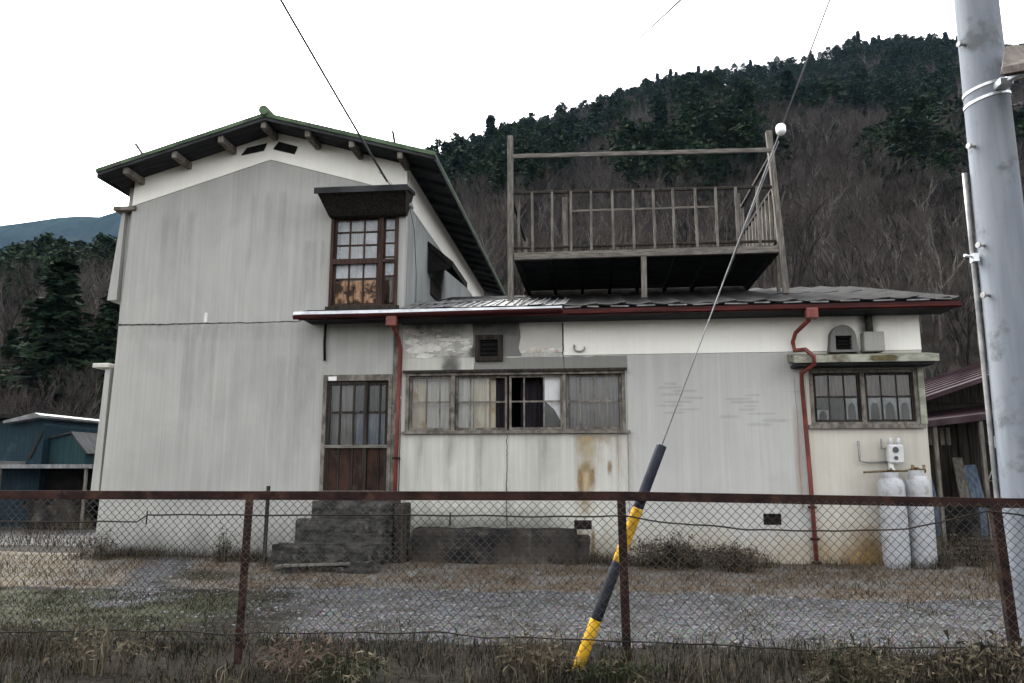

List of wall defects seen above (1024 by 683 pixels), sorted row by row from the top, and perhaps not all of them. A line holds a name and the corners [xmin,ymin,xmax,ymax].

peeling [403,324,473,358]
rust [578,435,594,502]